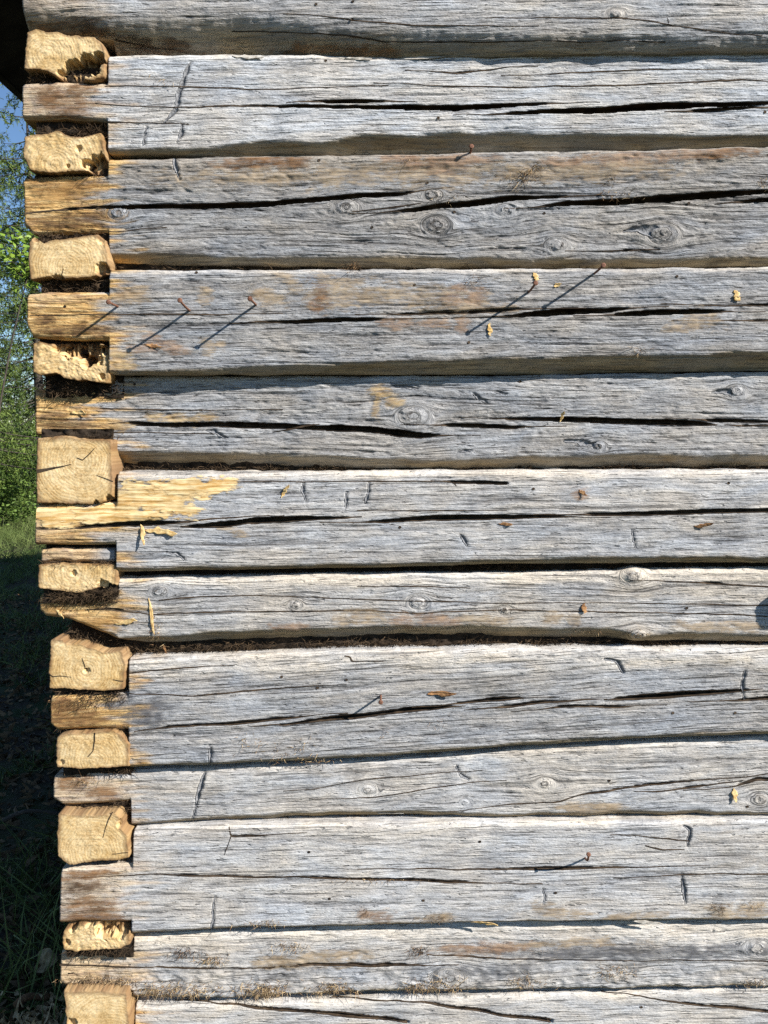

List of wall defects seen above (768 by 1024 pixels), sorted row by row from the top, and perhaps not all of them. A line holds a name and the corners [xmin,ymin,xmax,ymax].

crack [76,14,768,125]
crack [26,187,768,233]
crack [30,303,768,324]
crack [100,408,768,438]
spalling [36,475,238,529]
crack [36,480,768,529]
crack [134,688,768,732]